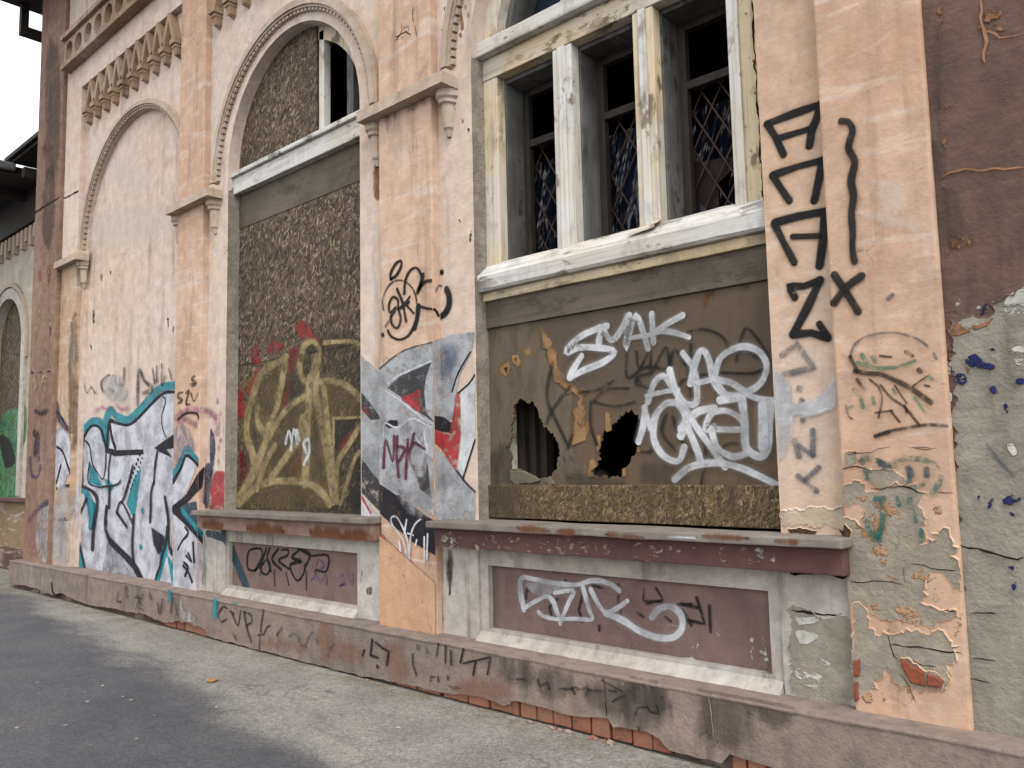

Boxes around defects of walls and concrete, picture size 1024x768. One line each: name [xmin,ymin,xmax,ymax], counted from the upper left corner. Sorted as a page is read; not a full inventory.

peeling [488,322,591,485]
peeling [779,283,1024,739]
crack [790,545,1024,585]
flaking render [381,679,674,754]